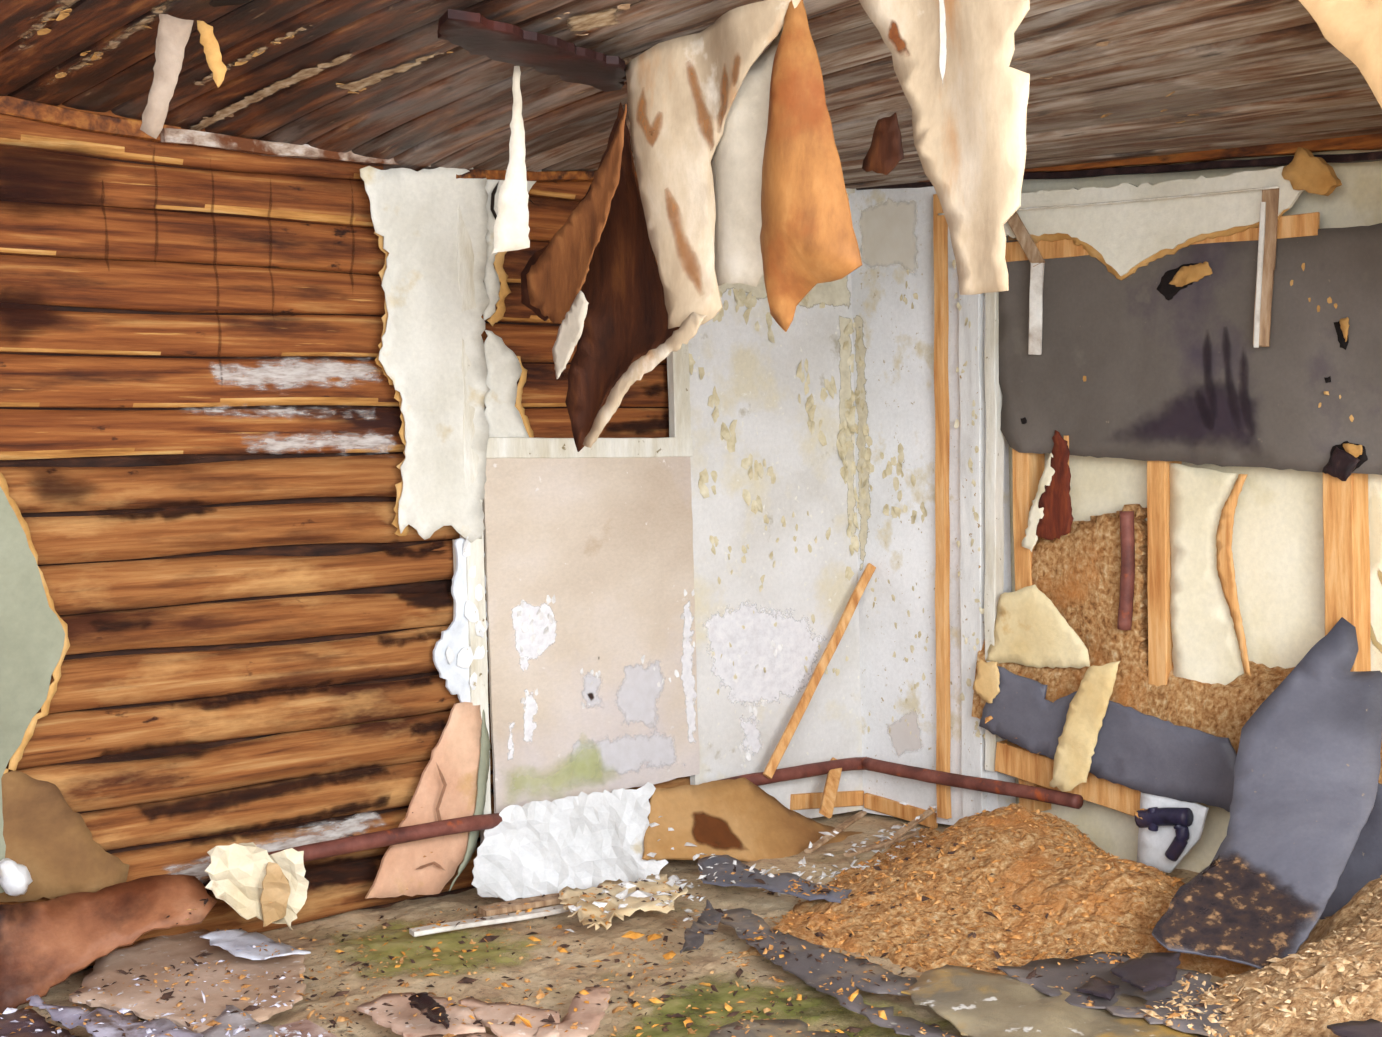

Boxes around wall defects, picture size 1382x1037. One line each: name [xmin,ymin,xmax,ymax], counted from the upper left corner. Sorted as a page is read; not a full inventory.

peeling [195,27,306,85]
peeling [190,54,352,131]
peeling [336,52,453,94]
peeling [553,4,631,36]
peeling [860,200,918,309]
spalling [1030,222,1259,280]
damp [1135,333,1254,445]
peeling [571,275,928,778]
flaking render [433,537,489,703]
peeling [511,595,557,671]
peeling [507,689,538,760]